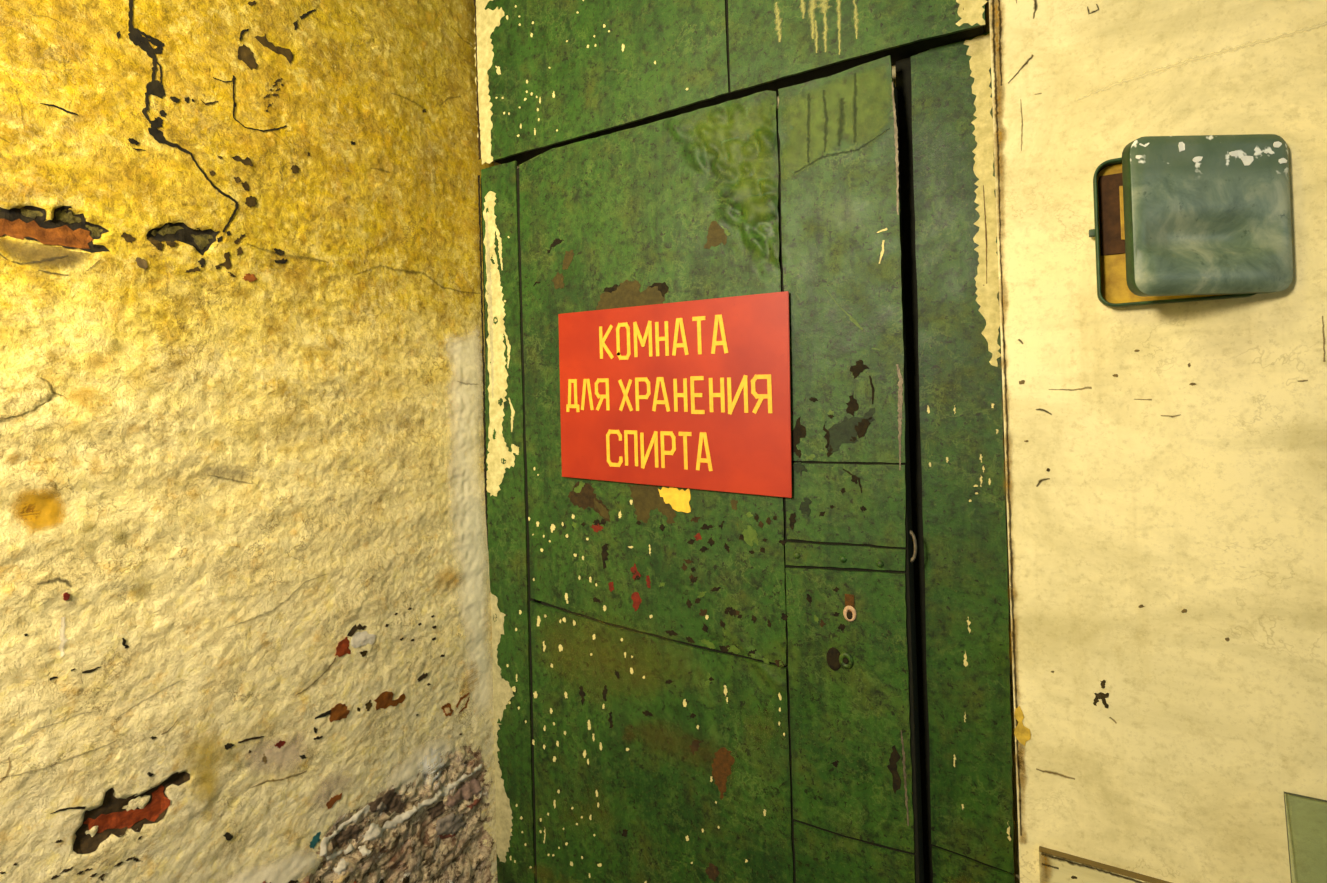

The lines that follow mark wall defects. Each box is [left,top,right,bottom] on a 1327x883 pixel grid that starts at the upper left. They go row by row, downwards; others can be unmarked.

crack [116,0,239,233]
crack [213,75,287,132]
flaking render [0,206,257,282]
peeling [297,607,412,695]
peeling [314,691,406,740]
flaking render [50,771,190,881]
flaking render [224,733,510,883]